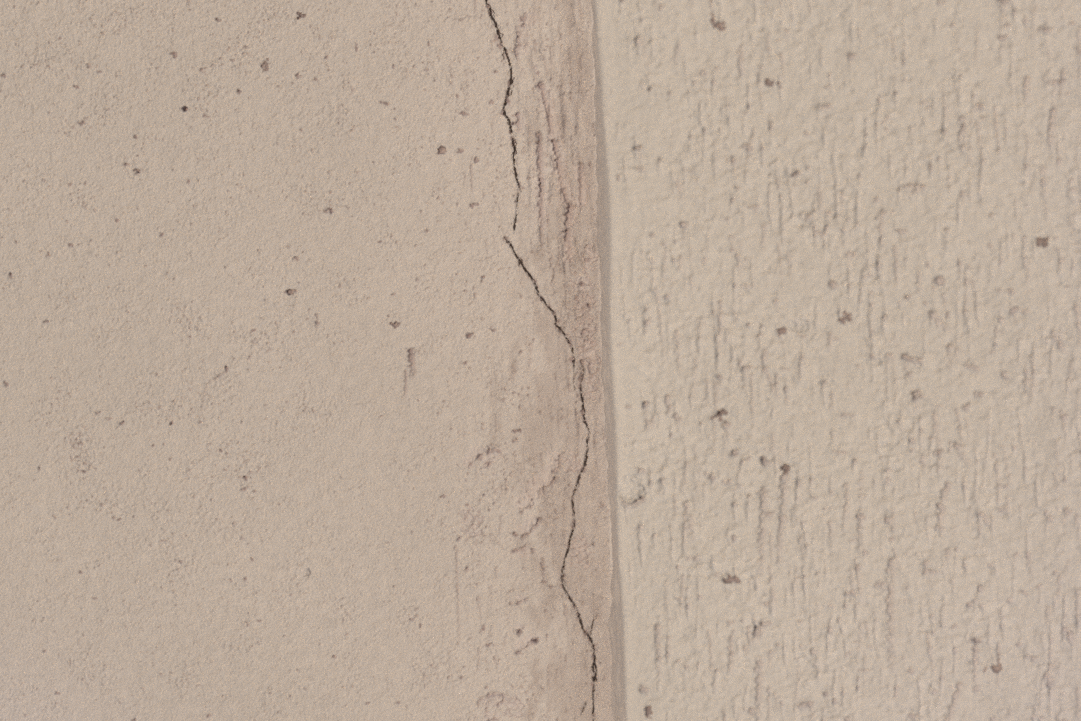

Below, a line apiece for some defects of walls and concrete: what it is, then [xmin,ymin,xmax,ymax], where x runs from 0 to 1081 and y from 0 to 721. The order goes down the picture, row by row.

crack [485,0,597,721]